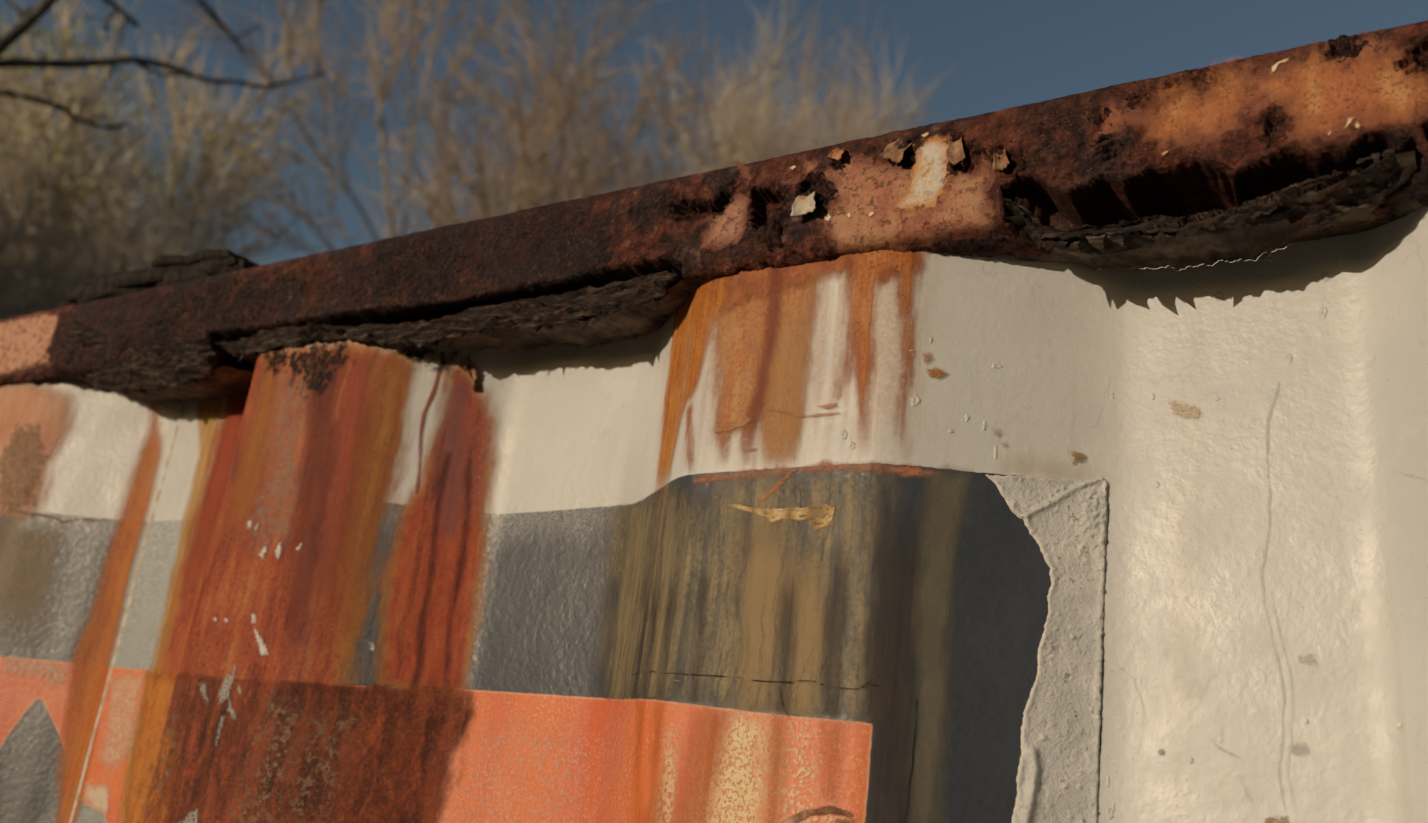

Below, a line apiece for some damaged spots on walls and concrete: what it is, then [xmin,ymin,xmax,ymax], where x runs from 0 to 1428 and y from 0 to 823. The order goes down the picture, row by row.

peeling [828,148,846,161]
peeling [880,138,912,163]
peeling [946,137,966,165]
peeling [993,148,1010,171]
peeling [790,190,816,217]
corrosion [1002,136,1421,271]
corrosion [0,383,70,518]
corrosion [57,207,939,823]
spalling [723,474,836,530]
peeling [986,451,1109,823]